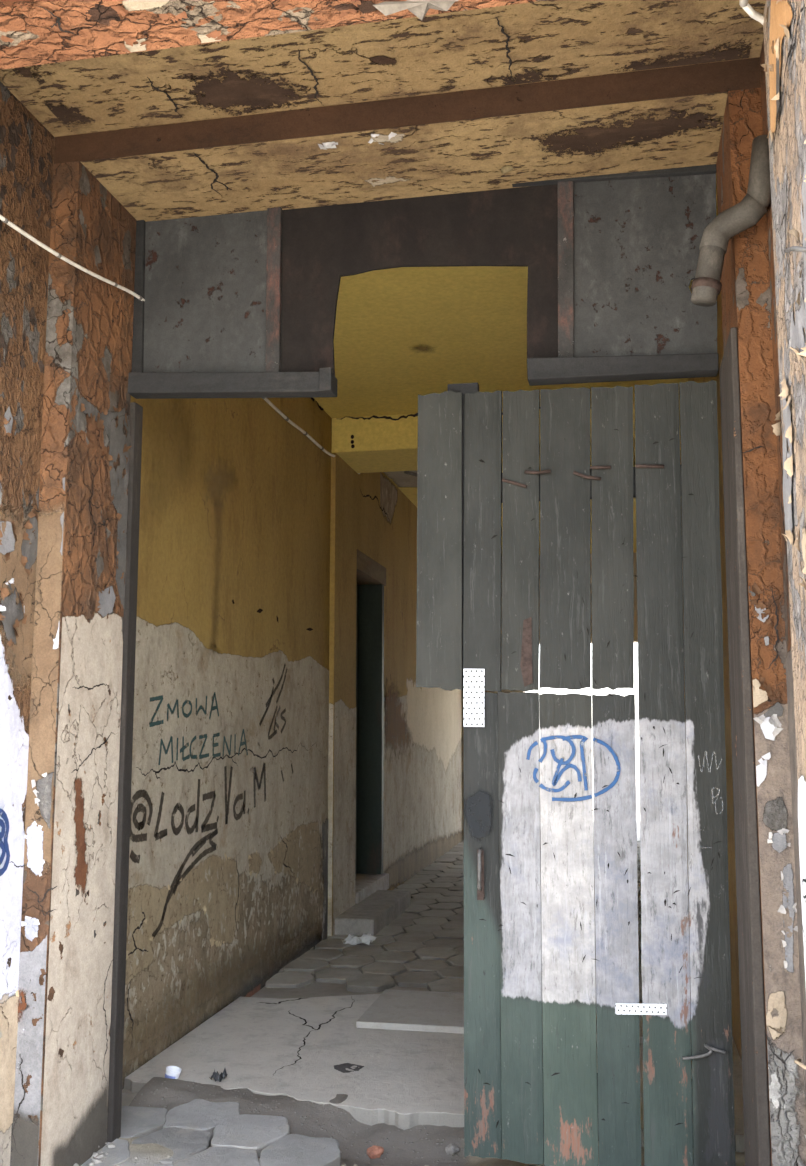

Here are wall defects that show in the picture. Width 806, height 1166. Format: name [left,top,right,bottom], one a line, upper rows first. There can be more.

peeling [118,37,150,53]
peeling [103,0,188,23]
peeling [198,30,226,43]
crack [496,17,514,80]
peeling [787,160,806,365]
peeling [81,396,131,619]
peeling [771,377,806,591]
flaking render [0,509,38,647]
peeling [749,582,771,646]
peeling [752,677,784,787]
crack [9,861,57,916]
peeling [762,797,798,973]